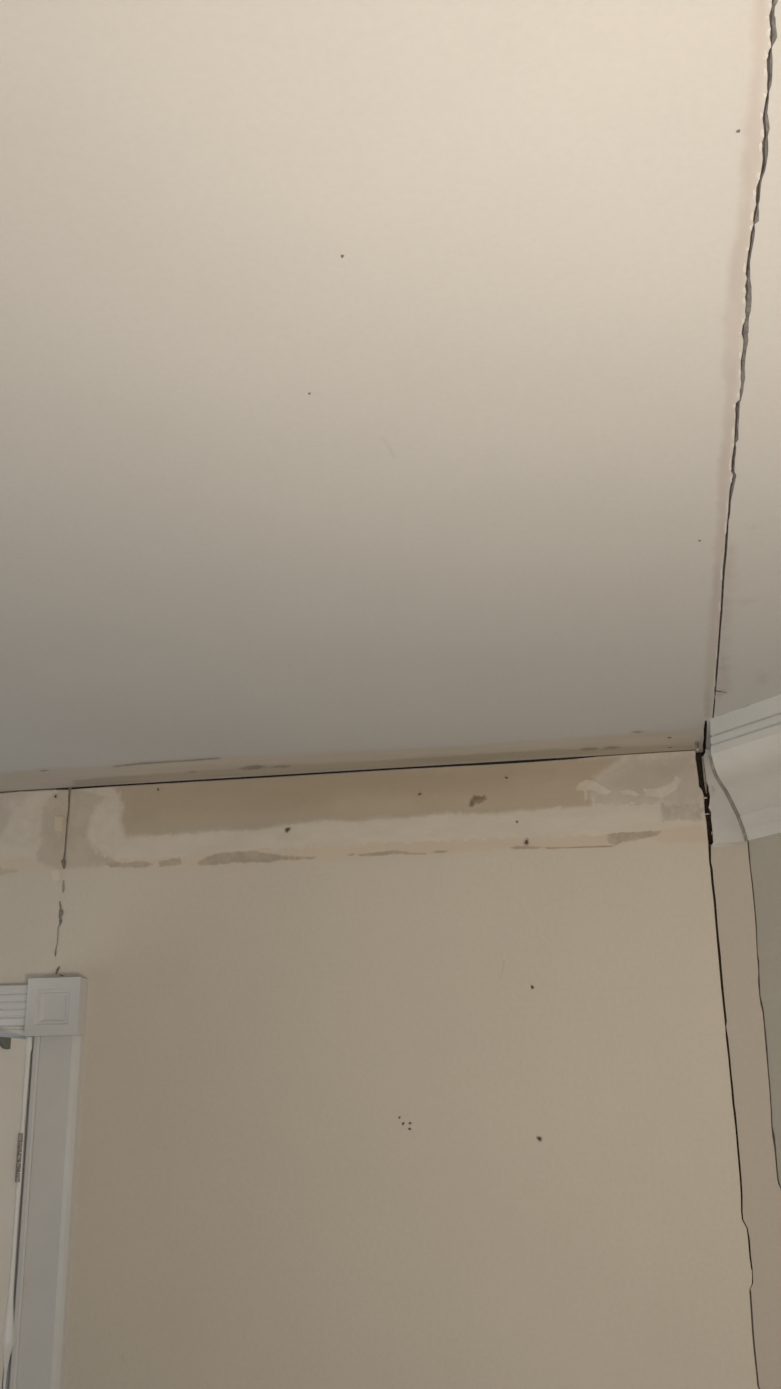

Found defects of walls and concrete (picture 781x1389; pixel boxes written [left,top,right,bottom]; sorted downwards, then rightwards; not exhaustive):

crack [712,0,778,718]
crack [0,721,781,1270]
crack [749,1283,760,1389]